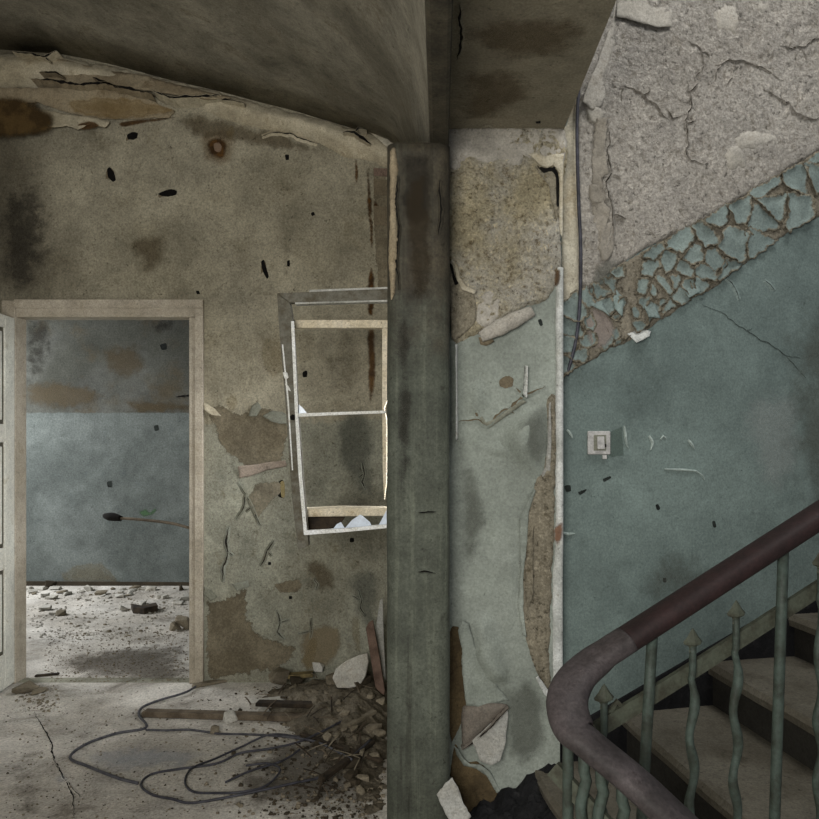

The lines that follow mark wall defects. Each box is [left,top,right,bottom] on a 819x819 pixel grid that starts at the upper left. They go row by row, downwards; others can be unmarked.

crack [768,27,819,61]
water stain [0,98,52,137]
flaking render [0,53,398,300]
rust [208,139,226,158]
rust [367,180,378,244]
flaking render [449,0,819,440]
crack [613,41,819,165]
crack [702,304,806,378]
flaking render [203,402,288,517]
flaking render [518,394,587,697]
crack [33,712,81,819]
flaking render [437,621,509,819]